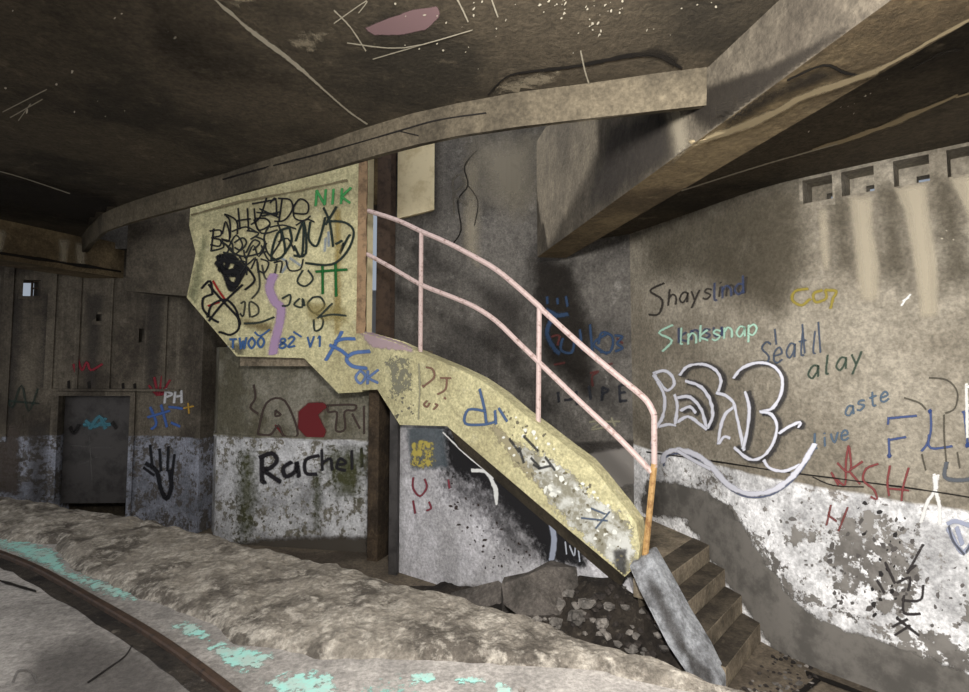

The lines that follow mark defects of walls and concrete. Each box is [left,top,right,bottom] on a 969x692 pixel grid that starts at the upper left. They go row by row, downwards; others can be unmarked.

crack [453,151,478,243]
water stain [653,197,795,296]
water stain [238,449,367,553]
spalling [0,411,744,692]
peeling [576,441,969,692]